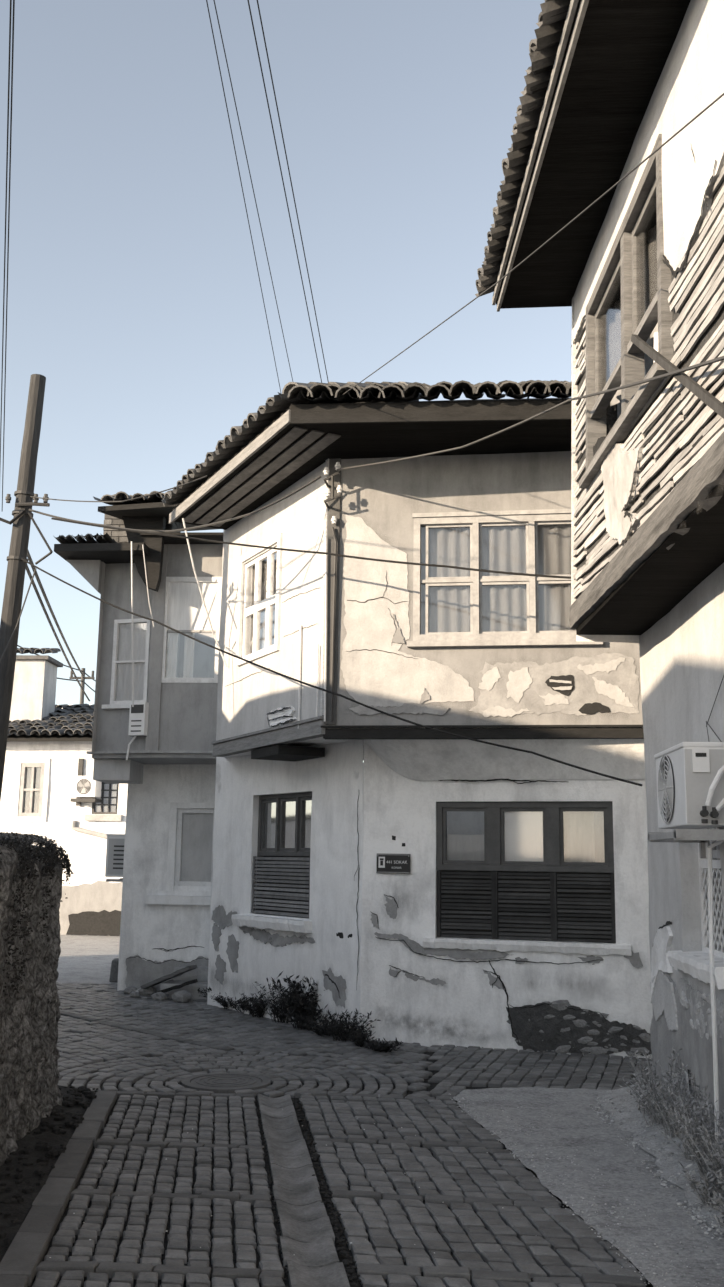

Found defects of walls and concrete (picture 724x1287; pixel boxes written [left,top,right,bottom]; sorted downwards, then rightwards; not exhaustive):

spalling [663,160,716,277]
spalling [593,437,606,457]
peeling [620,450,639,547]
crack [289,572,417,659]
peeling [340,515,640,718]
peeling [125,905,315,992]
spalling [370,895,604,991]
crack [489,960,607,1043]
peeling [624,921,724,1138]